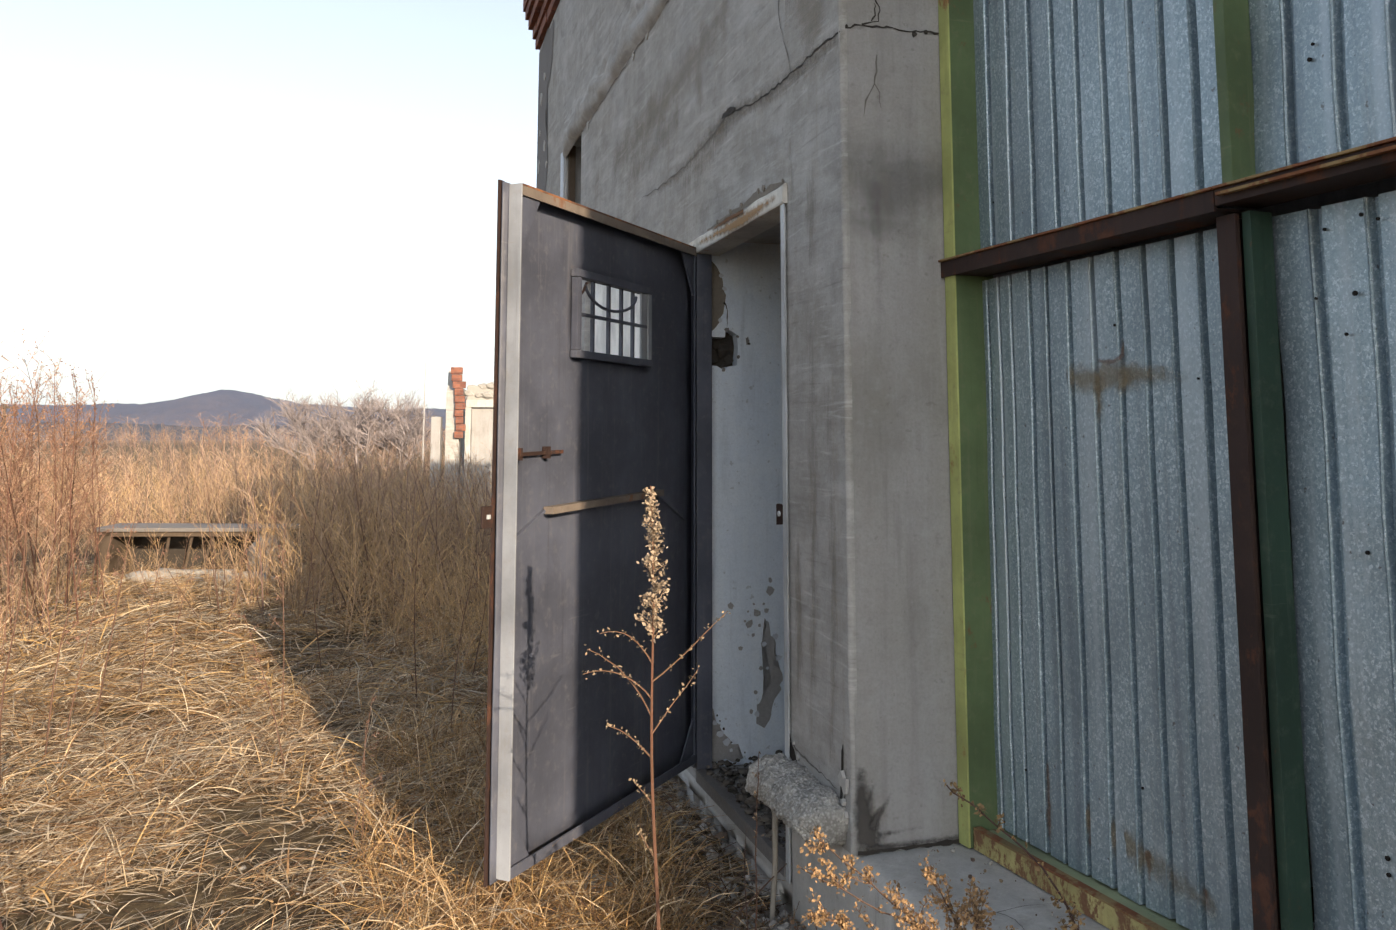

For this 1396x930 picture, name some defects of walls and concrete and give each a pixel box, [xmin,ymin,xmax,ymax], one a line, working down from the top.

crack [640,0,939,201]
spalling [707,179,784,231]
peeling [728,577,783,728]